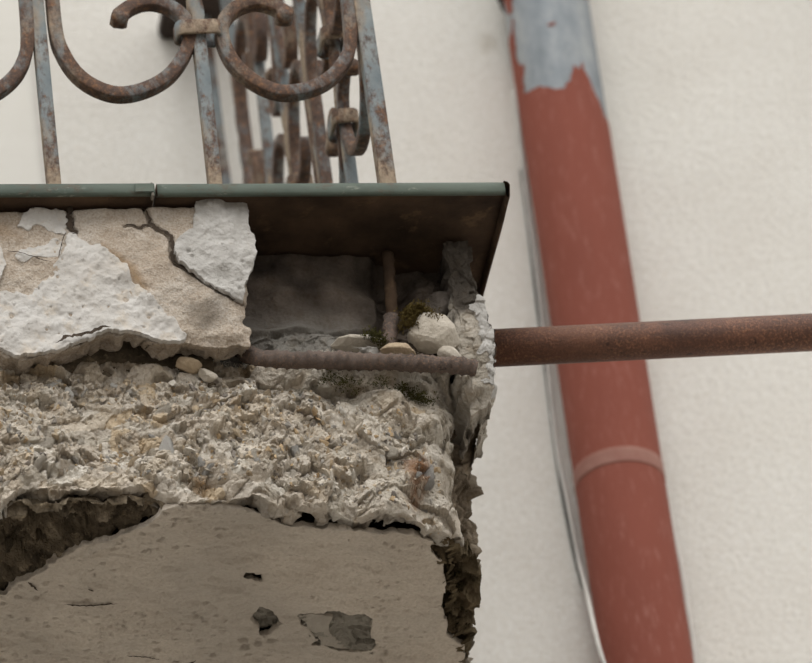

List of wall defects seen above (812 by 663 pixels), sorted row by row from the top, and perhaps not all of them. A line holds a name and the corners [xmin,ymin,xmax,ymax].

spalling [0,207,497,663]